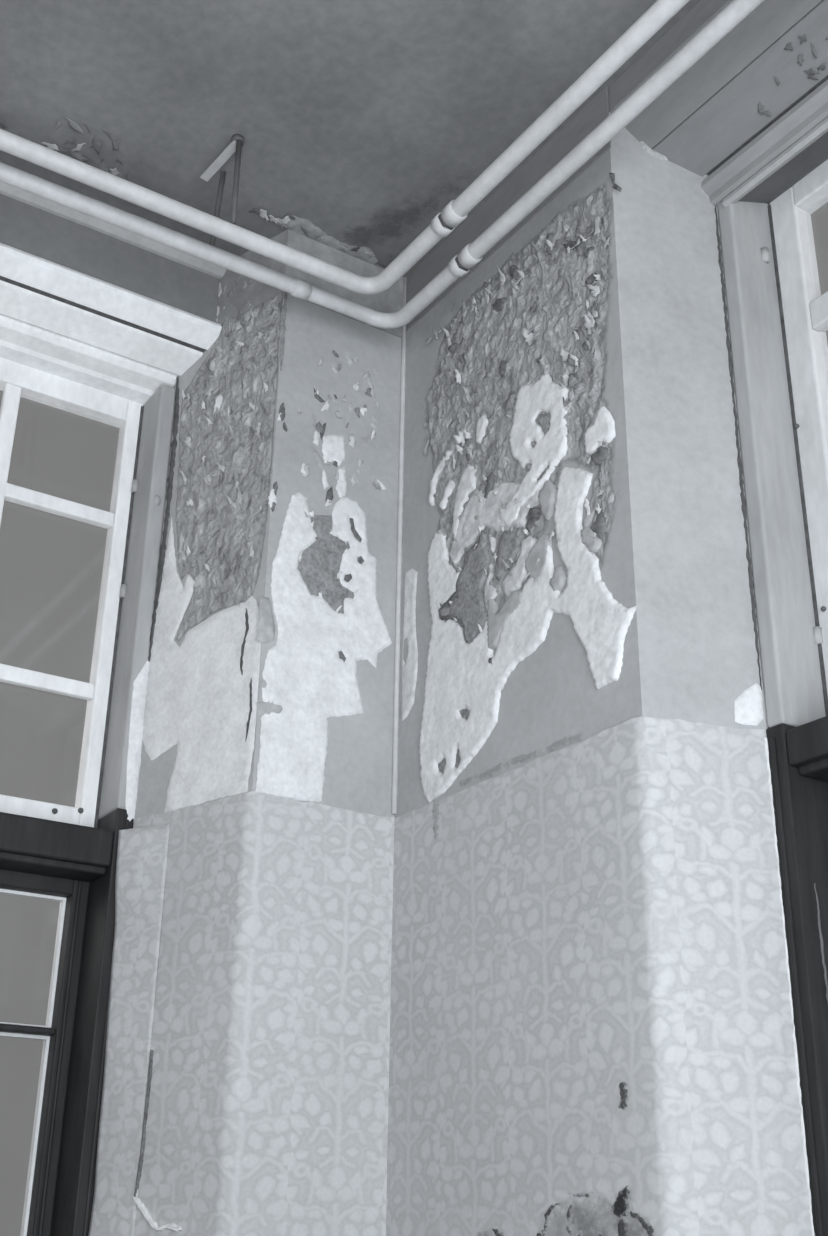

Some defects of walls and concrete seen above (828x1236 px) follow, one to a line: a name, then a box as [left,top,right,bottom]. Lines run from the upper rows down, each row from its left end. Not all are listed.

peeling [125,173,638,821]
crack [240,609,252,742]
flaking render [734,683,763,726]
crack [132,1050,182,1233]